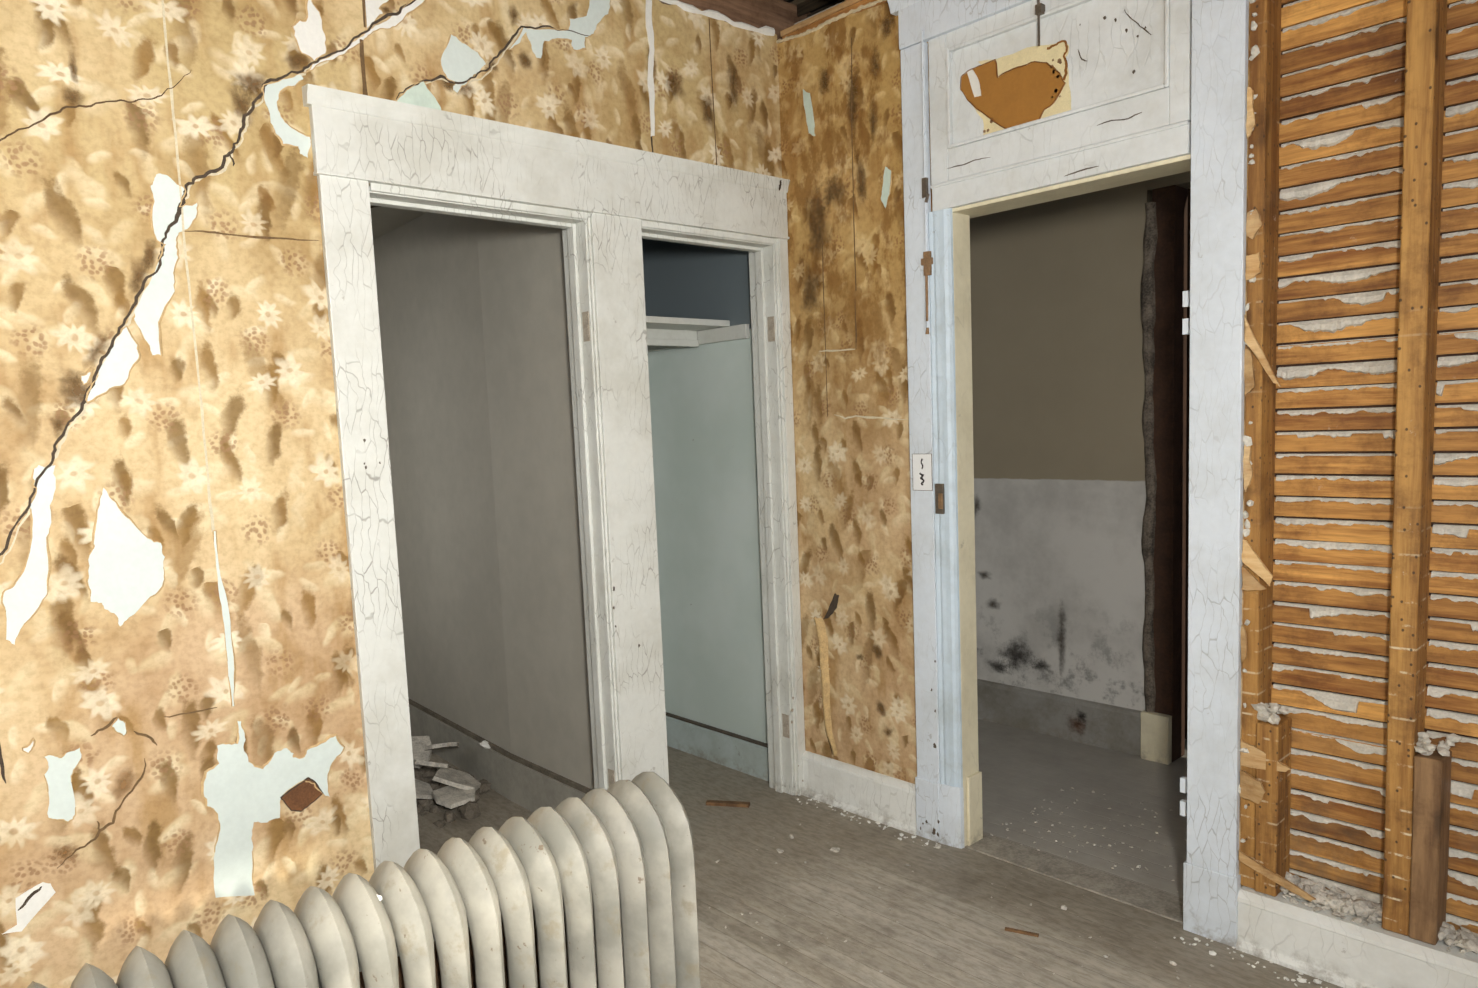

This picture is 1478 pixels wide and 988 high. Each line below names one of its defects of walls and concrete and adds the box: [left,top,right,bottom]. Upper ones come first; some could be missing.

peeling [261,0,426,158]
crack [396,25,591,100]
peeling [80,174,199,404]
crack [0,0,416,565]
flaking render [1273,0,1407,904]
peeling [1,465,56,645]
peeling [22,738,81,823]
peeling [86,488,165,627]
crack [57,707,217,868]
peeling [201,530,345,898]
damp [991,614,1064,672]
flaking render [1426,524,1478,926]